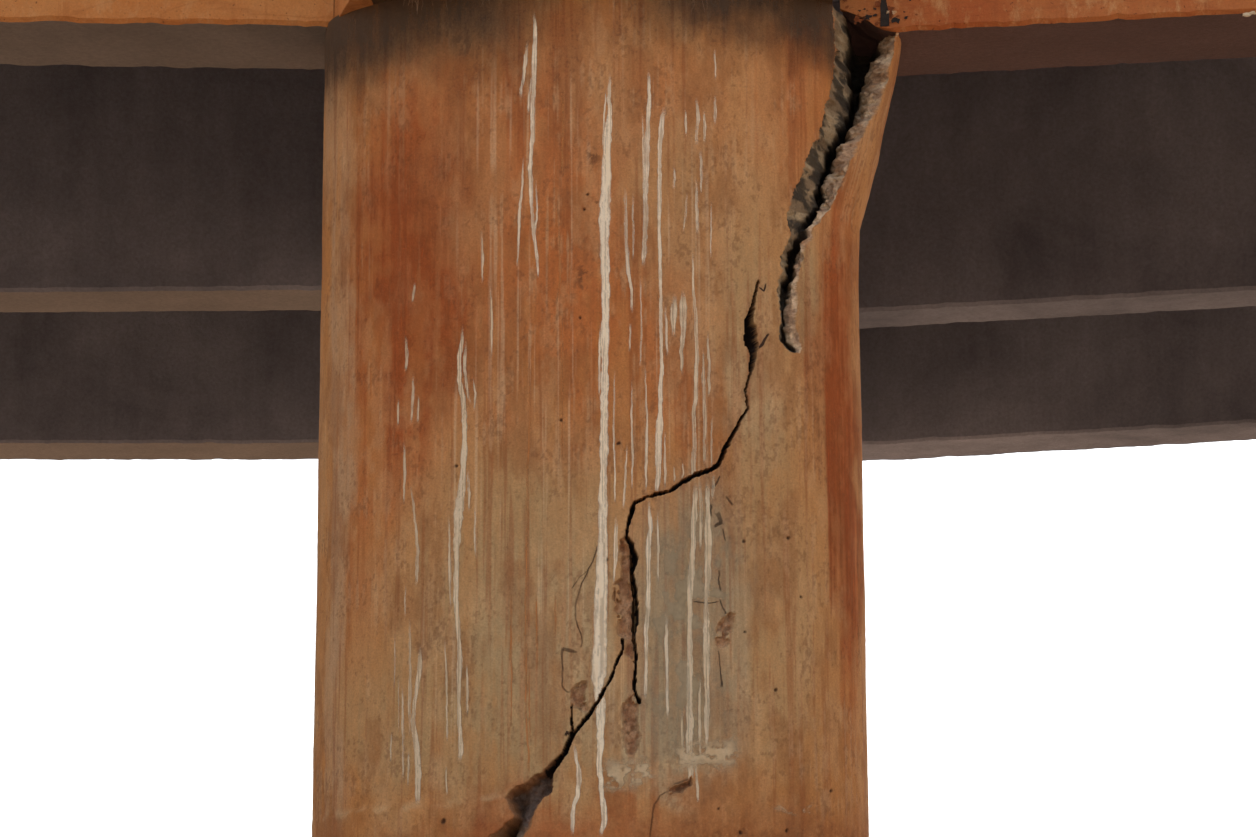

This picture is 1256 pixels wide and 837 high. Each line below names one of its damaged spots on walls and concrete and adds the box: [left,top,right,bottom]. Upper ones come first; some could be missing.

crack [880,0,889,27]
efflorescence [518,20,539,274]
efflorescence [390,643,422,799]
efflorescence [445,335,477,758]
spalling [489,759,557,837]
spalling [612,537,634,663]
spalling [606,694,652,789]
leakage [592,81,712,832]
leakage [644,484,727,798]
flaking render [669,739,735,795]
crack [544,8,870,779]
rust [825,360,859,599]